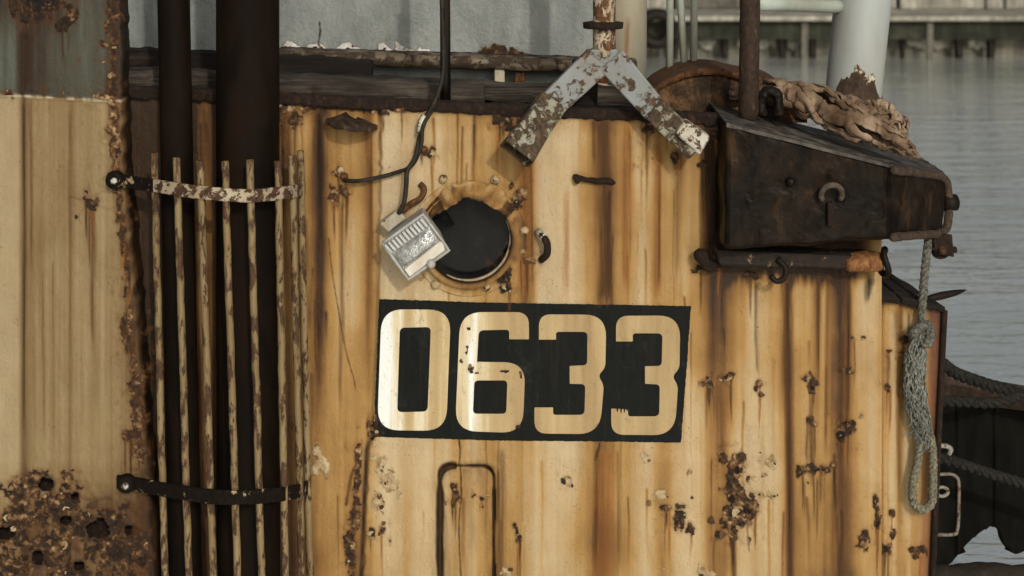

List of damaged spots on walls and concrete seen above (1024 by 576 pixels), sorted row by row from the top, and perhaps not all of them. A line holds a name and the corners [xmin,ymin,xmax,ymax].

corrosion [93,0,122,172]
corrosion [115,187,149,474]
corrosion [0,469,152,576]
peeling [311,441,330,481]
corrosion [343,443,391,576]
corrosion [659,503,695,547]
corrosion [708,452,761,576]
corrosion [784,280,866,575]
corrosion [855,494,896,575]
corrosion [908,545,929,574]